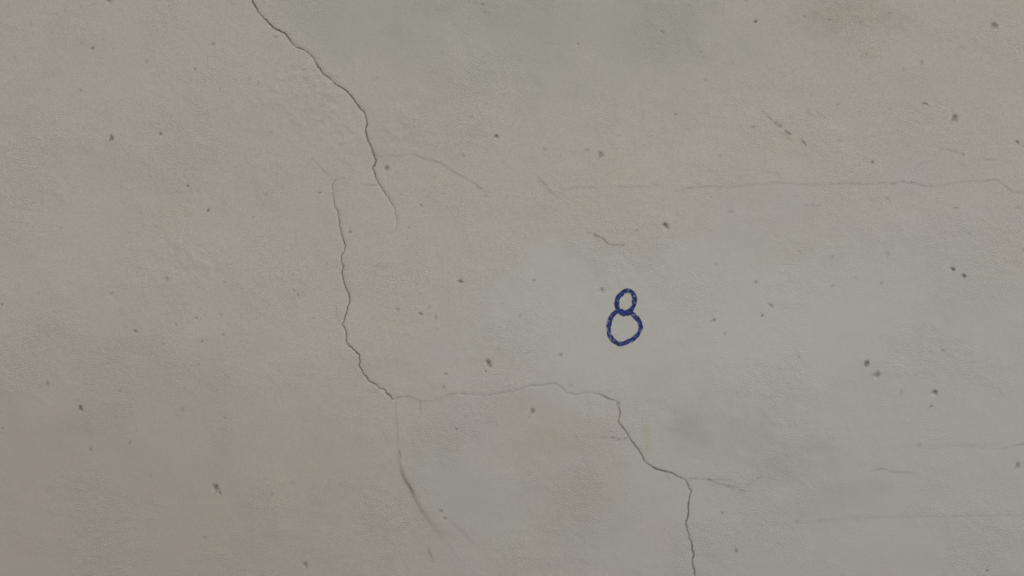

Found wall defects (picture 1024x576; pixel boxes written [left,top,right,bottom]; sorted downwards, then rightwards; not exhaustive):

crack [251,0,768,576]